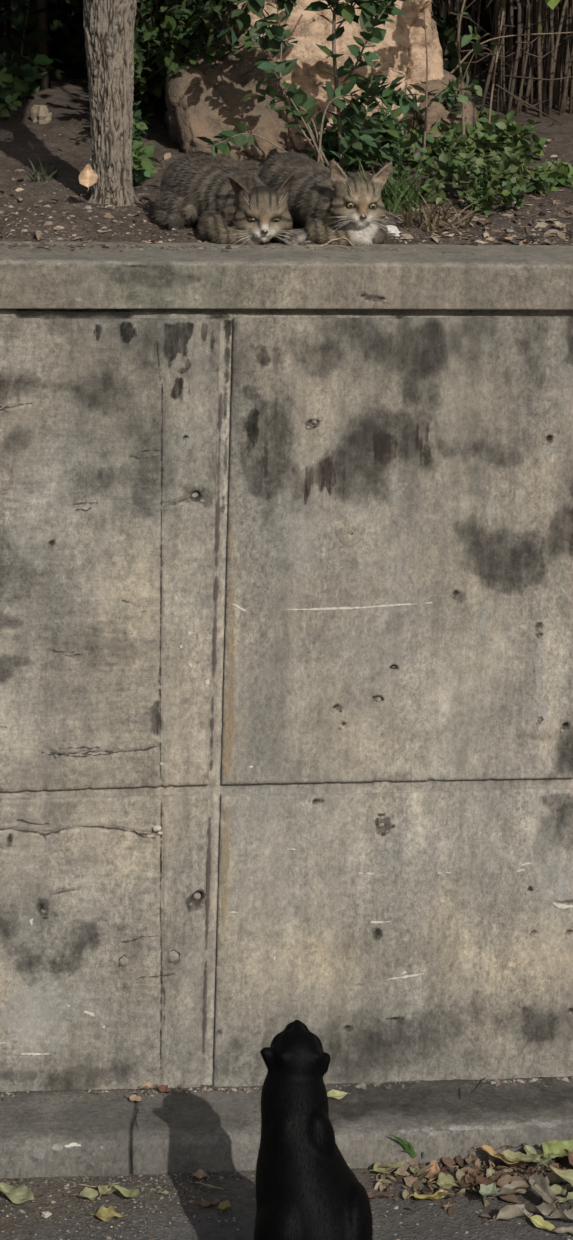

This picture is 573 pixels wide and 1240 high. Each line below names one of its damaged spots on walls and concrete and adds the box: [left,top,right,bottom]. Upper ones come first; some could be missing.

damp [165,320,232,381]
damp [171,372,183,399]
damp [244,403,286,447]
damp [312,415,432,498]
crack [0,347,174,1068]
crack [131,1108,139,1175]